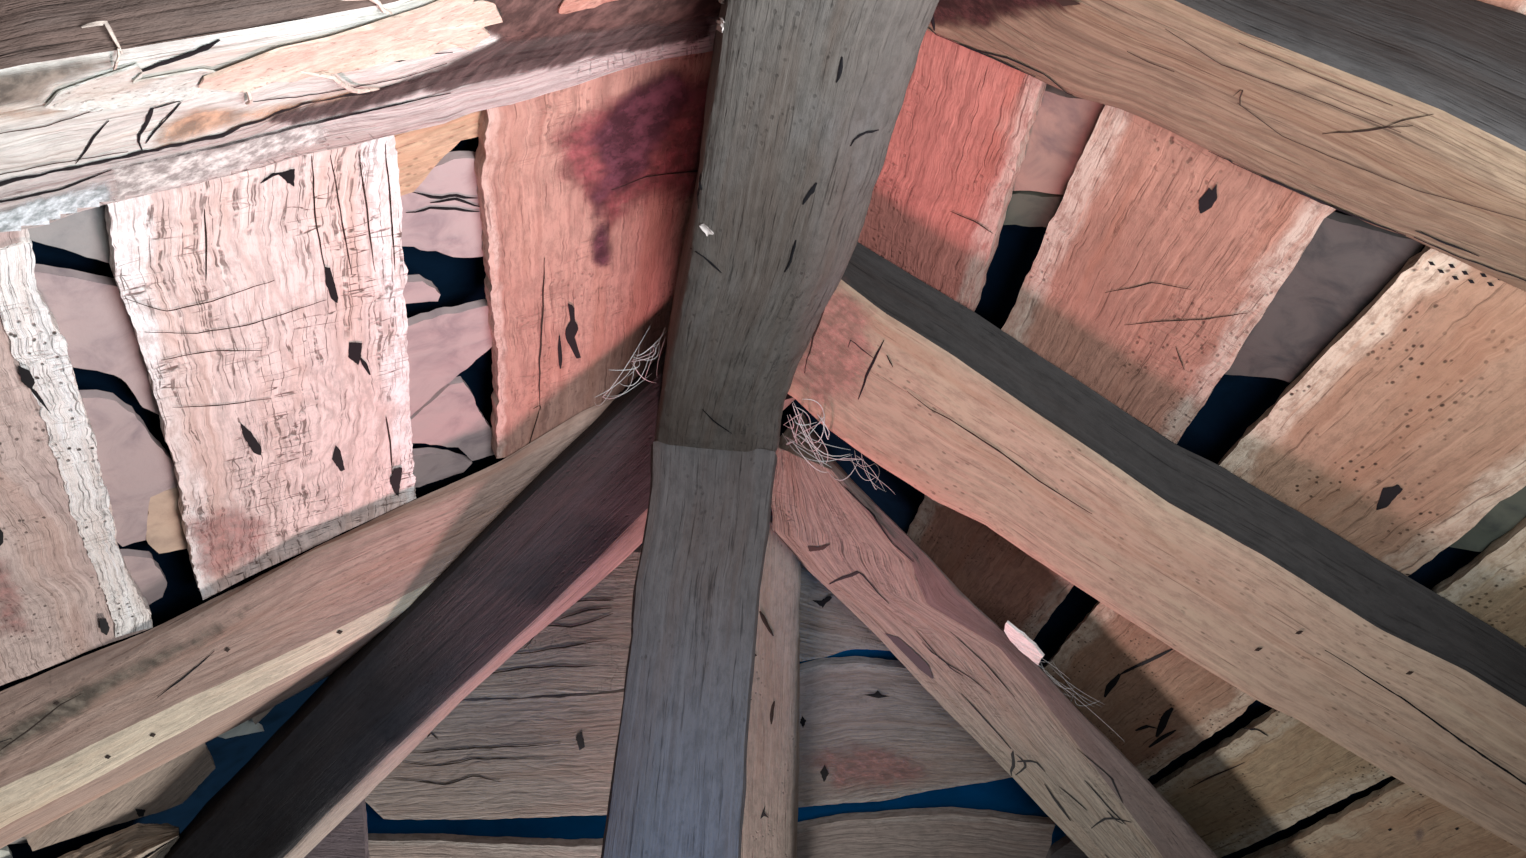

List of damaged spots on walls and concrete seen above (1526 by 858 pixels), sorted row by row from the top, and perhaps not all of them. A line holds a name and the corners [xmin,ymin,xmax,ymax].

crack [142,39,220,72]
crack [0,52,480,360]
water stain [0,0,721,232]
water stain [563,72,707,266]